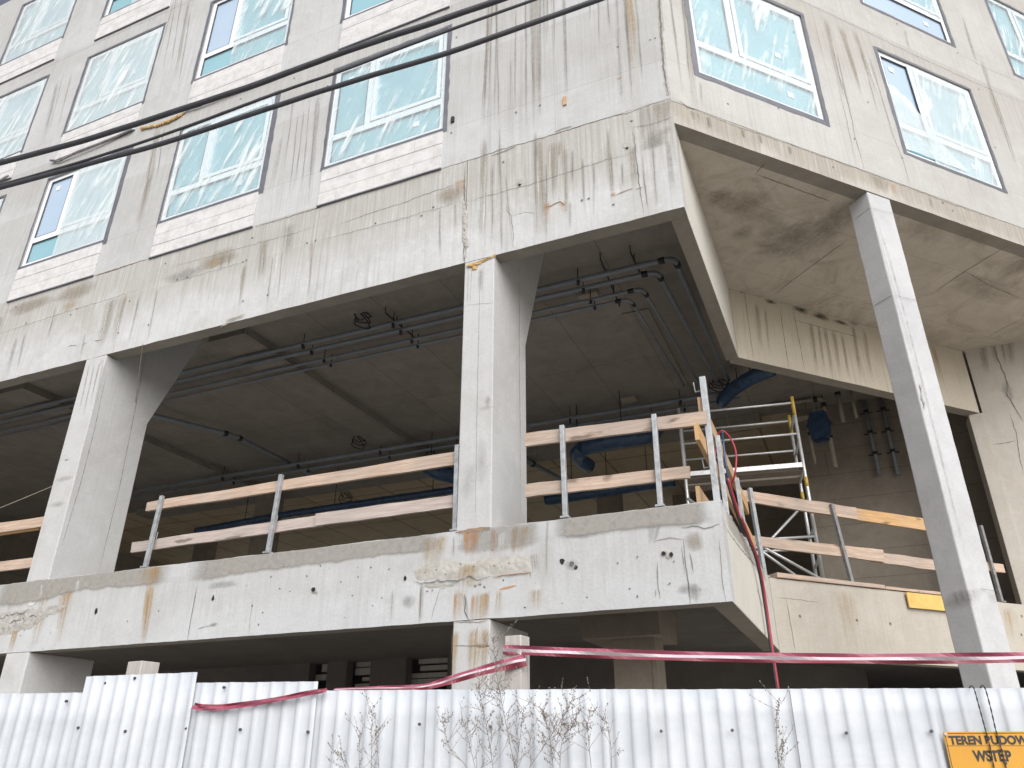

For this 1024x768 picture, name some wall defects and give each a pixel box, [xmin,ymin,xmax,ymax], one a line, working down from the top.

water stain [535,143,584,206]
crack [178,81,1008,280]
crack [859,208,1020,365]
crack [994,323,1023,469]
rust [455,527,495,547]
spalling [0,604,66,636]
rust [144,569,155,621]
spalling [404,554,535,592]
crack [654,524,814,646]